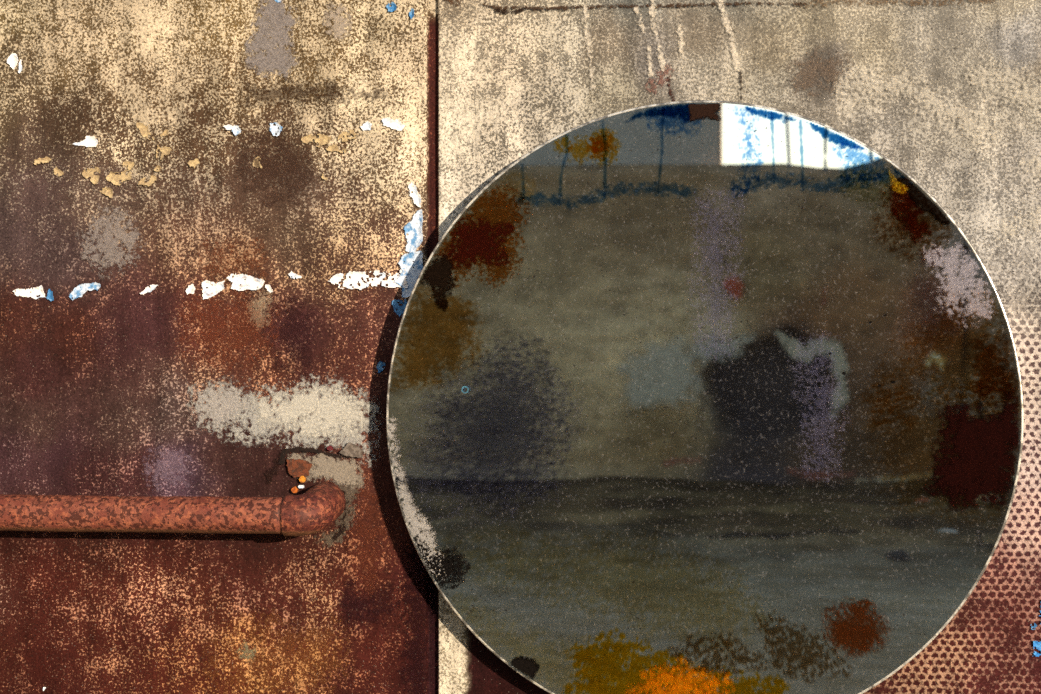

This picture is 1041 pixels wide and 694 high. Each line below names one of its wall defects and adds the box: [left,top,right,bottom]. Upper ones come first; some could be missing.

peeling [73,136,98,147]
peeling [223,124,241,136]
peeling [270,122,283,137]
peeling [301,117,406,153]
peeling [34,157,63,177]
peeling [82,122,172,198]
peeling [330,182,424,317]
peeling [13,285,54,301]
peeling [69,282,100,301]
peeling [186,273,273,300]